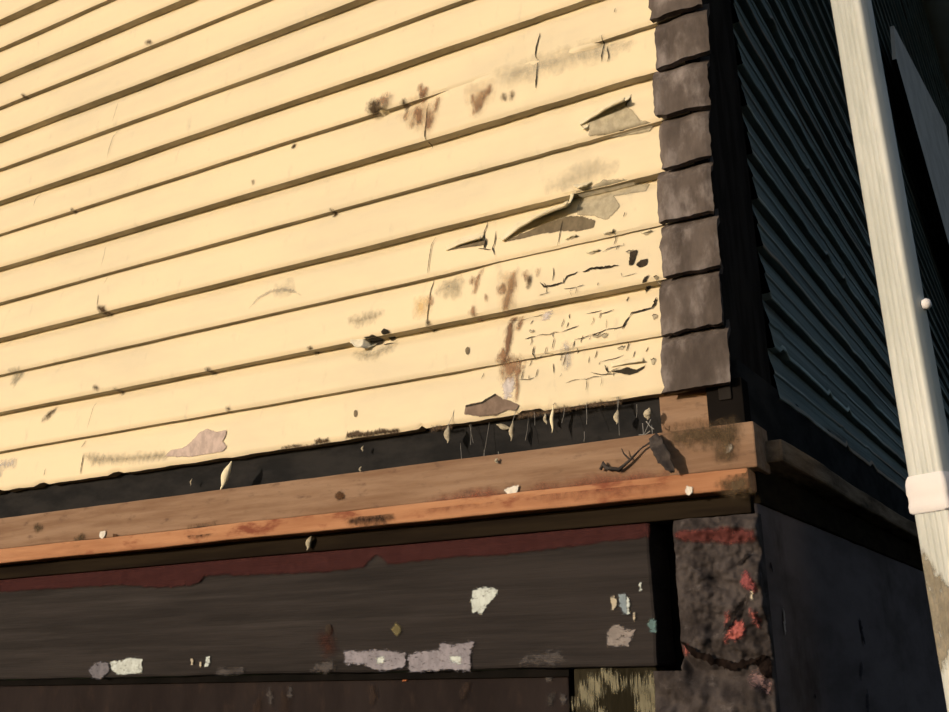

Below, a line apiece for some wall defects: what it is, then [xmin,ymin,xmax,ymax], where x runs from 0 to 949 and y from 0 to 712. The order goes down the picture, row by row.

rust [402,86,438,147]
rust [471,85,491,113]
peeling [579,94,653,138]
peeling [445,179,649,255]
rust [499,272,531,309]
crack [516,238,657,387]
peeling [350,328,396,356]
rust [496,317,522,399]
peeling [464,377,622,419]
peeling [471,587,498,614]
peeling [607,594,635,647]
peeling [313,641,474,674]